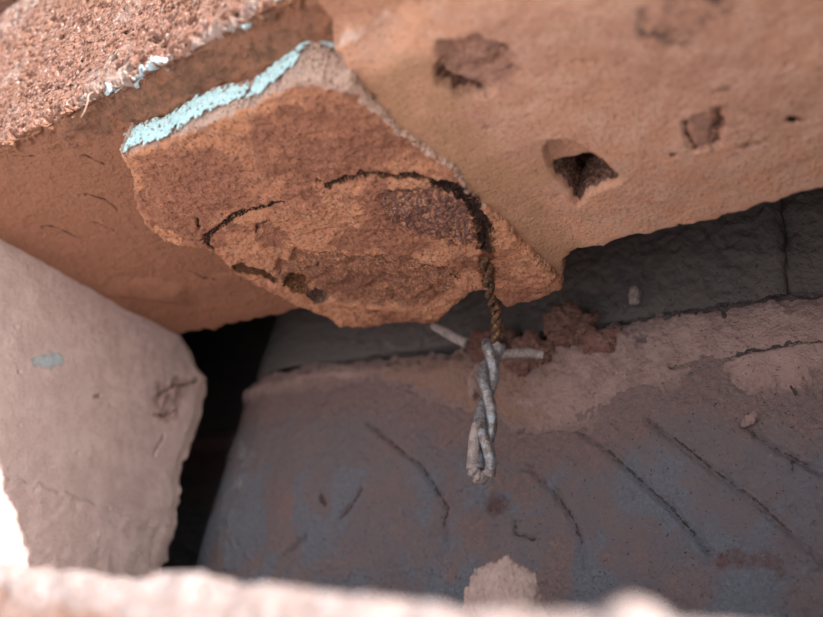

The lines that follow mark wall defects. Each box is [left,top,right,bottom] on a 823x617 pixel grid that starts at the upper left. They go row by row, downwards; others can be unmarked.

spalling [436,34,512,97]
spalling [683,107,725,149]
crack [197,200,285,252]
crack [316,170,494,253]